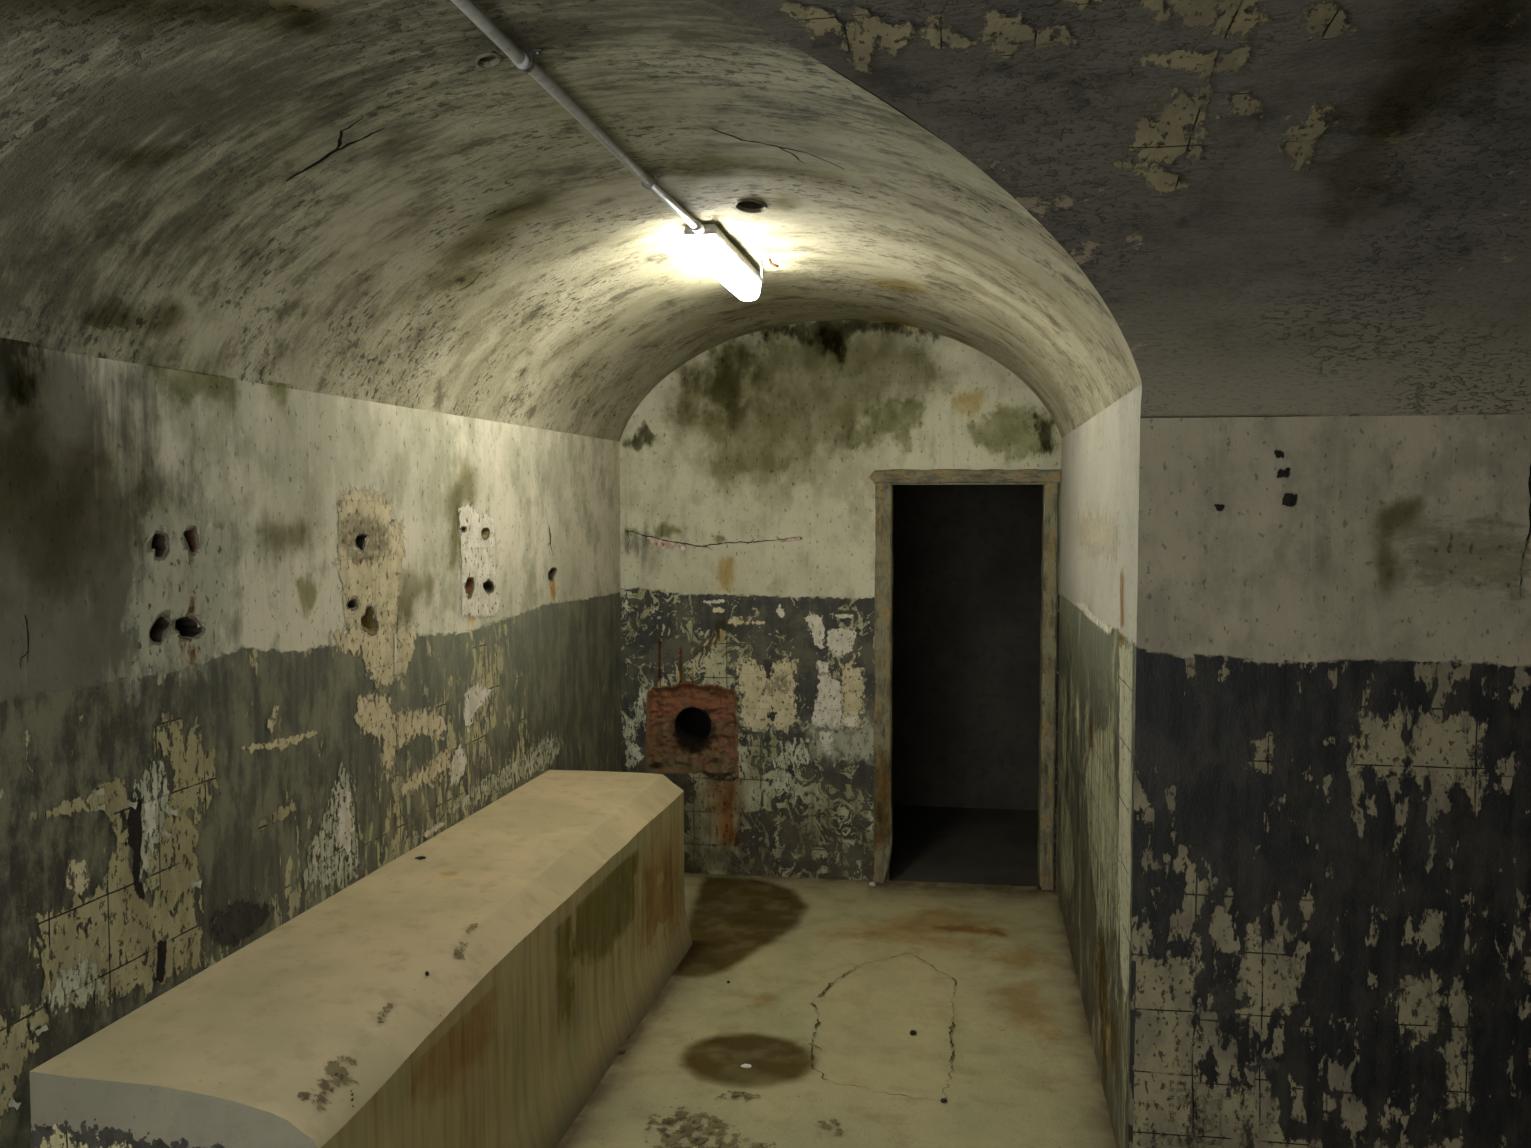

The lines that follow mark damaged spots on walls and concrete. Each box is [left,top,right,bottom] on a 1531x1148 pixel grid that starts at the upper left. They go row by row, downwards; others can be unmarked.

crack [286,117,385,181]
crack [712,128,843,169]
mould [764,320,938,361]
leakage [624,424,653,450]
crack [1519,465,1531,596]
peeling [329,483,563,844]
spalling [621,611,874,794]
peeling [0,712,221,1128]
leakage [677,878,804,975]
peeling [1060,599,1308,1148]
leakage [686,1035,809,1081]
crack [808,953,957,1101]